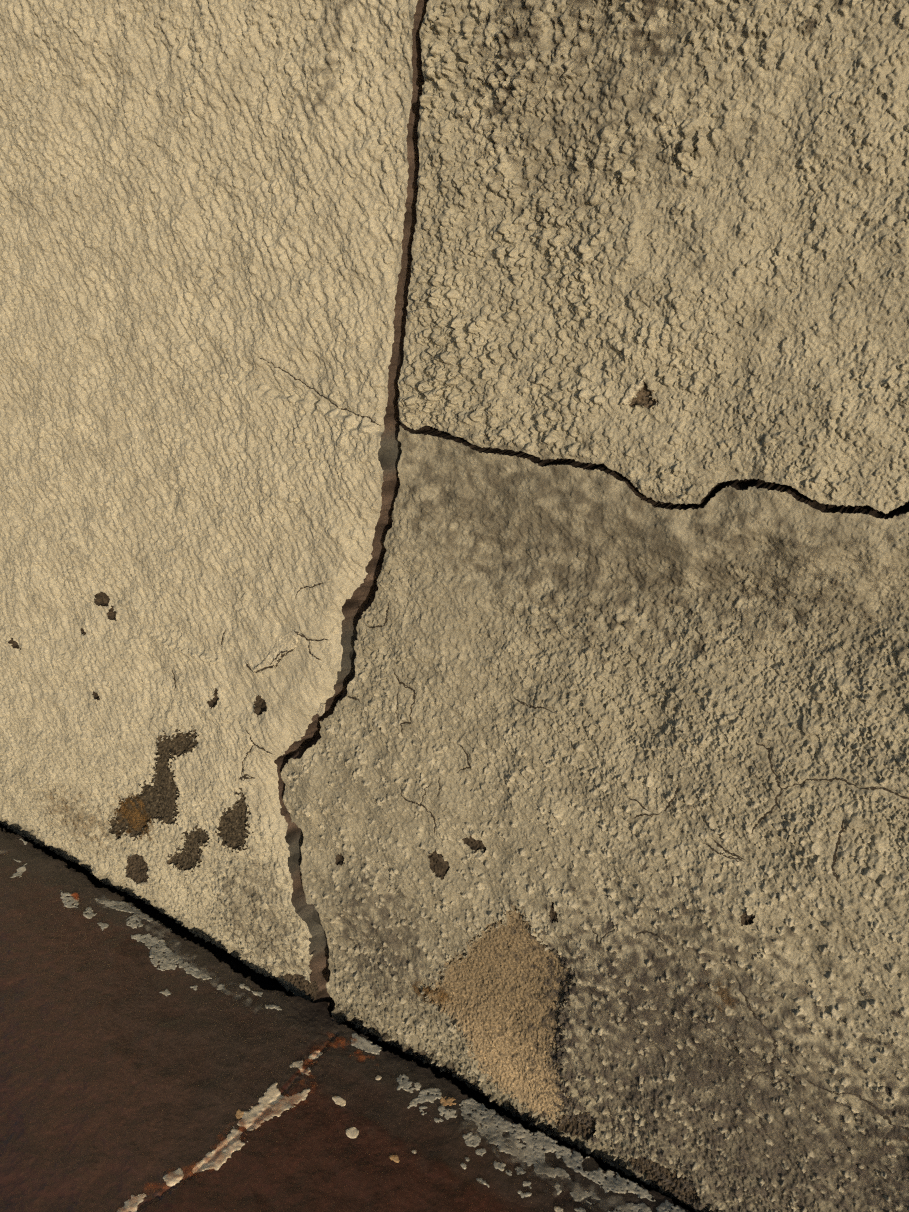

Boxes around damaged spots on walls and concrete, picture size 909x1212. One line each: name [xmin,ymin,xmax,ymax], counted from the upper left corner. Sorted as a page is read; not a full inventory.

crack [238,0,909,1011]
spalling [108,726,254,885]
spalling [396,902,701,1212]